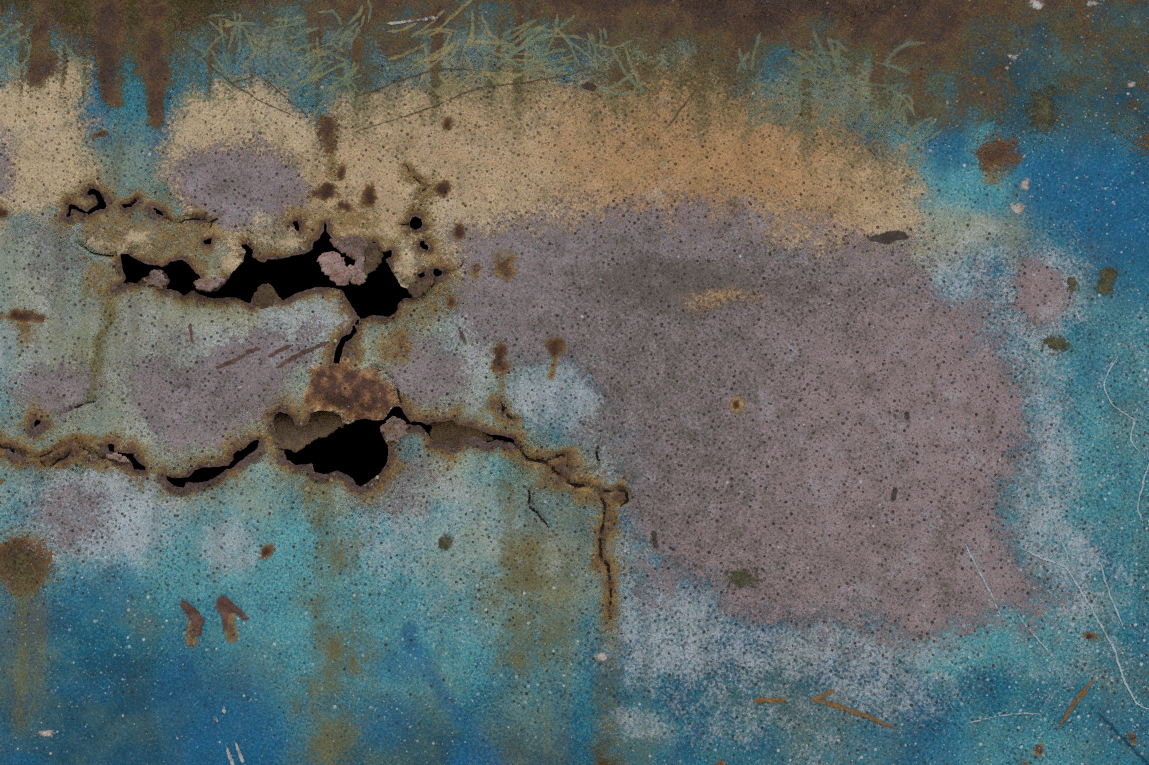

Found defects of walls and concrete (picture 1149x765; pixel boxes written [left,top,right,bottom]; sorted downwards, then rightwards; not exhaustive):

rust [0,0,1149,216]
peeling [143,269,168,290]
rust [0,306,46,352]
peeling [4,352,106,422]
peeling [117,283,345,462]
rust [302,358,398,424]
rust [490,341,511,401]
rust [546,337,568,381]
peeling [154,50,1083,671]
peeling [21,473,114,561]
crack [485,390,632,636]
rust [0,526,62,624]